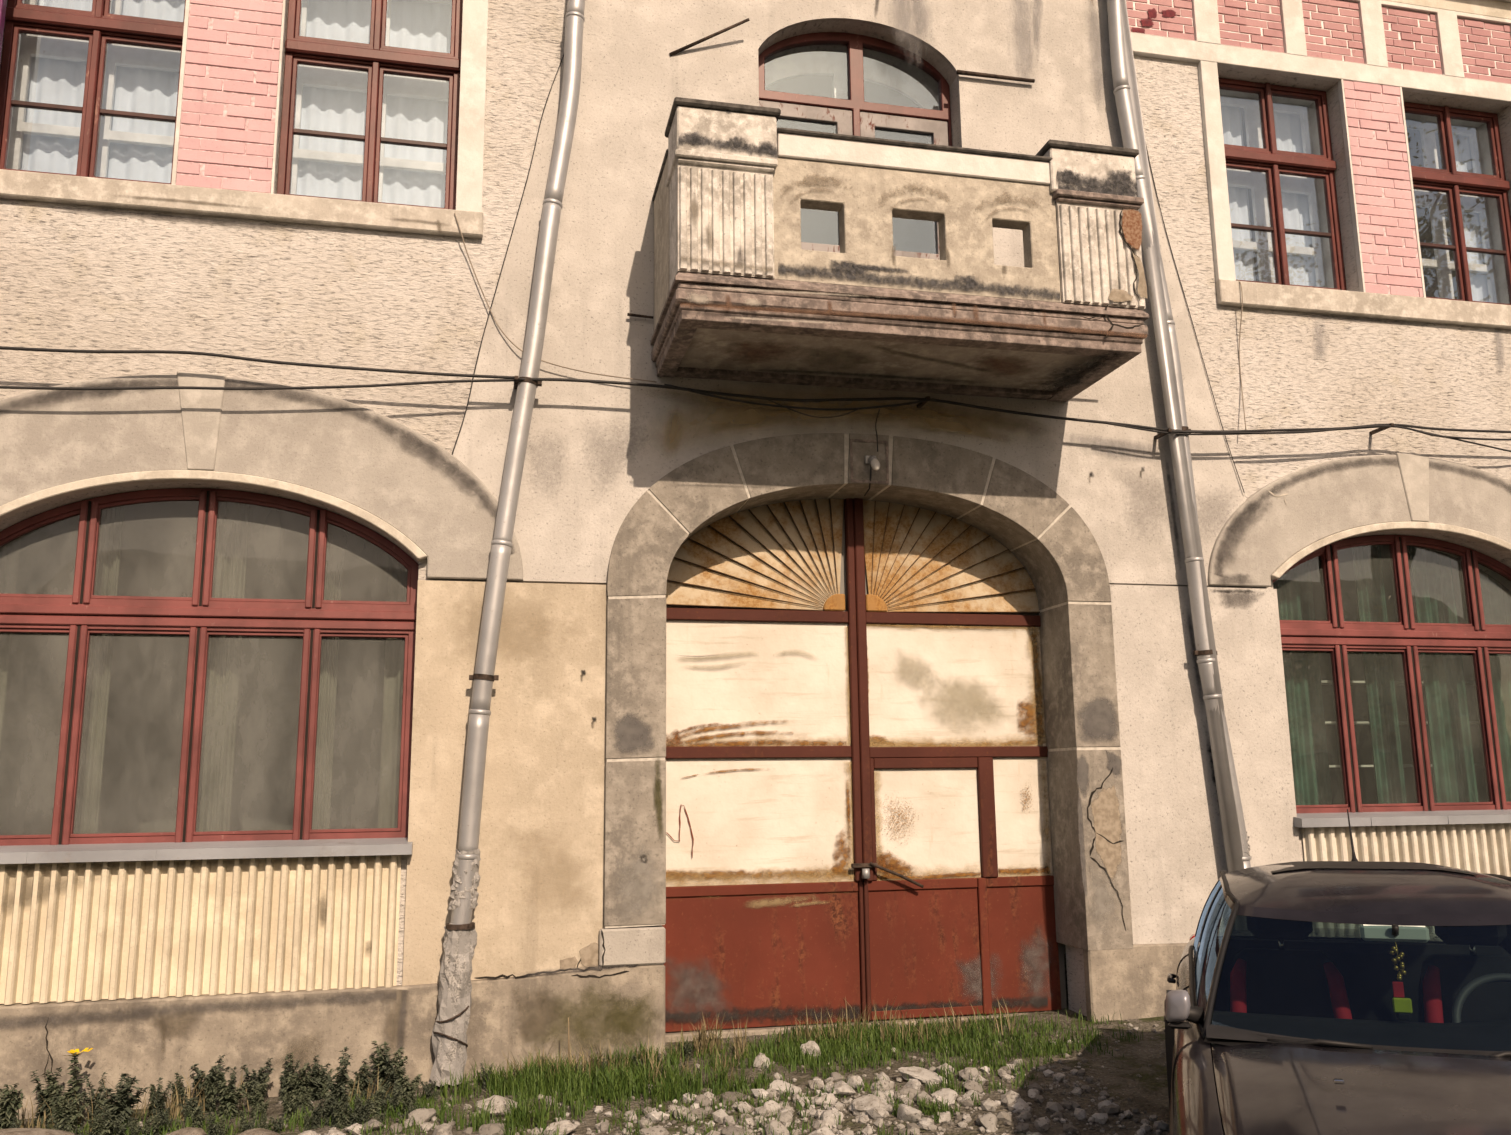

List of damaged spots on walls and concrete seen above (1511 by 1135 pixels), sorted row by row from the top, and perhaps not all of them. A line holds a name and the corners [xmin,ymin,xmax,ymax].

water stain [679,132,778,157]
water stain [1056,170,1138,197]
flaking render [1109,208,1147,302]
crack [474,930,637,979]